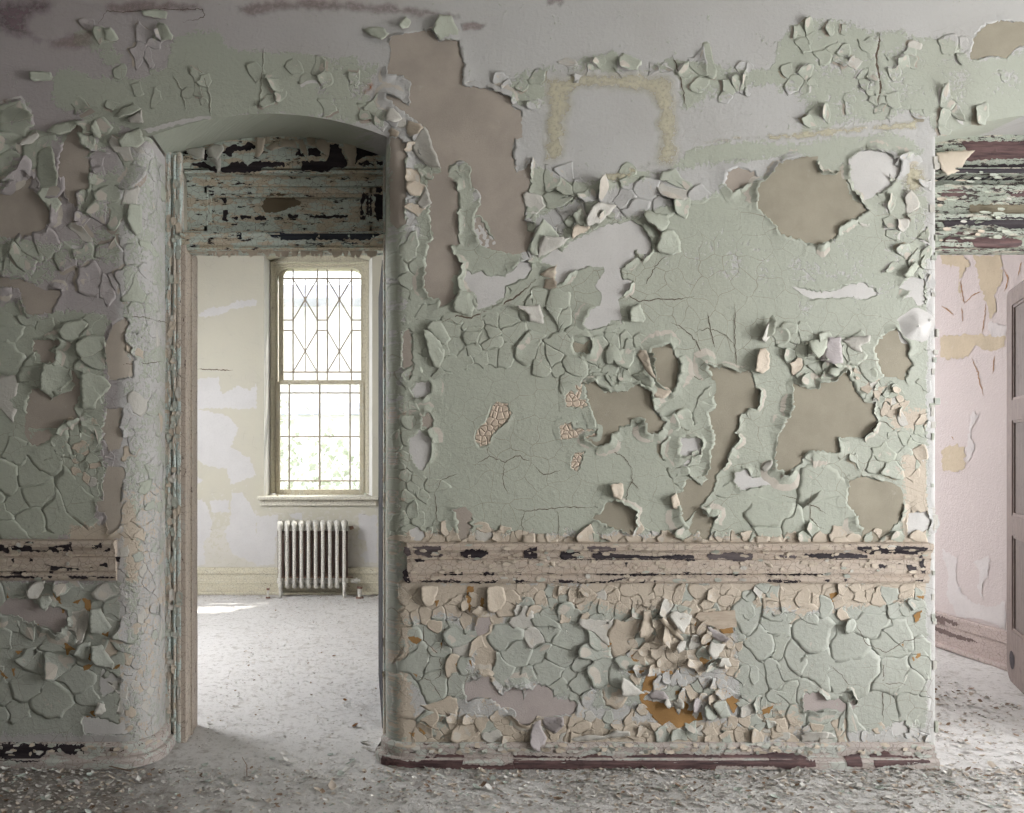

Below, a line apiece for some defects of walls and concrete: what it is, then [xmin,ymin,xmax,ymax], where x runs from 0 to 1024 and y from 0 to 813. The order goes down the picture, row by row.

flaking render [0,9,183,738]
crack [434,440,585,542]
flaking render [186,8,1024,770]